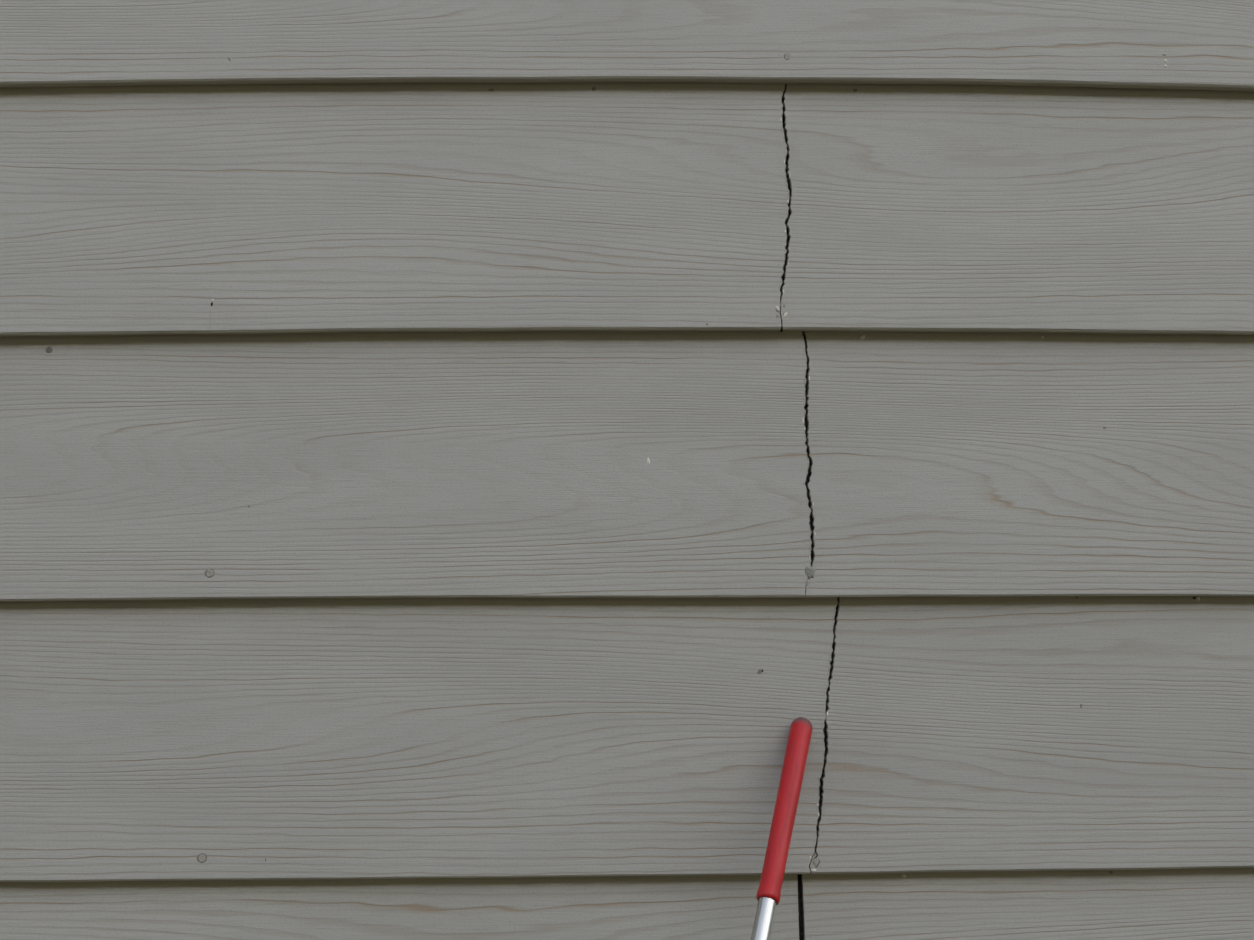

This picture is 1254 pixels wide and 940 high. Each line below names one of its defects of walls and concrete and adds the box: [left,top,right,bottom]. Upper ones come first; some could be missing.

crack [776,88,816,586]
crack [809,598,839,873]